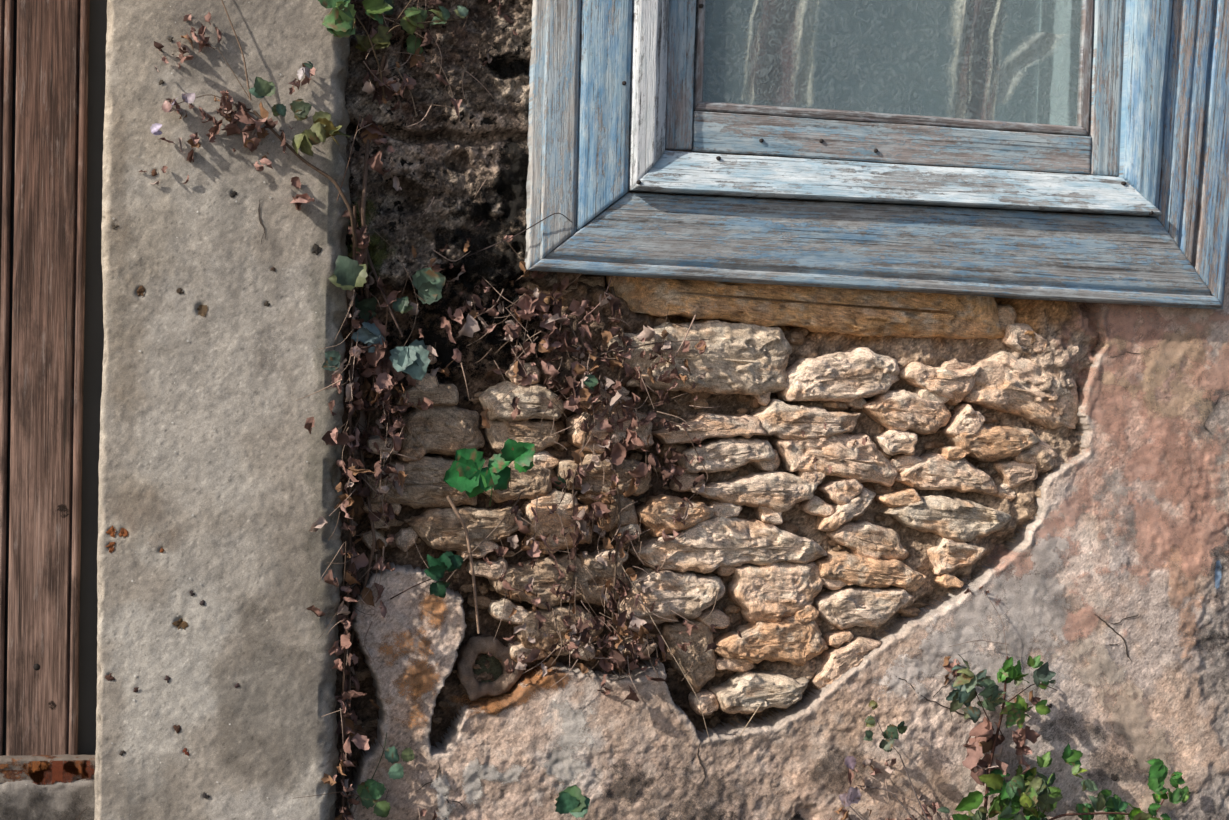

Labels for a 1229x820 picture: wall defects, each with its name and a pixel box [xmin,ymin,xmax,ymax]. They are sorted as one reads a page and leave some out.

corrosion [0,760,95,785]
spalling [334,0,1229,820]